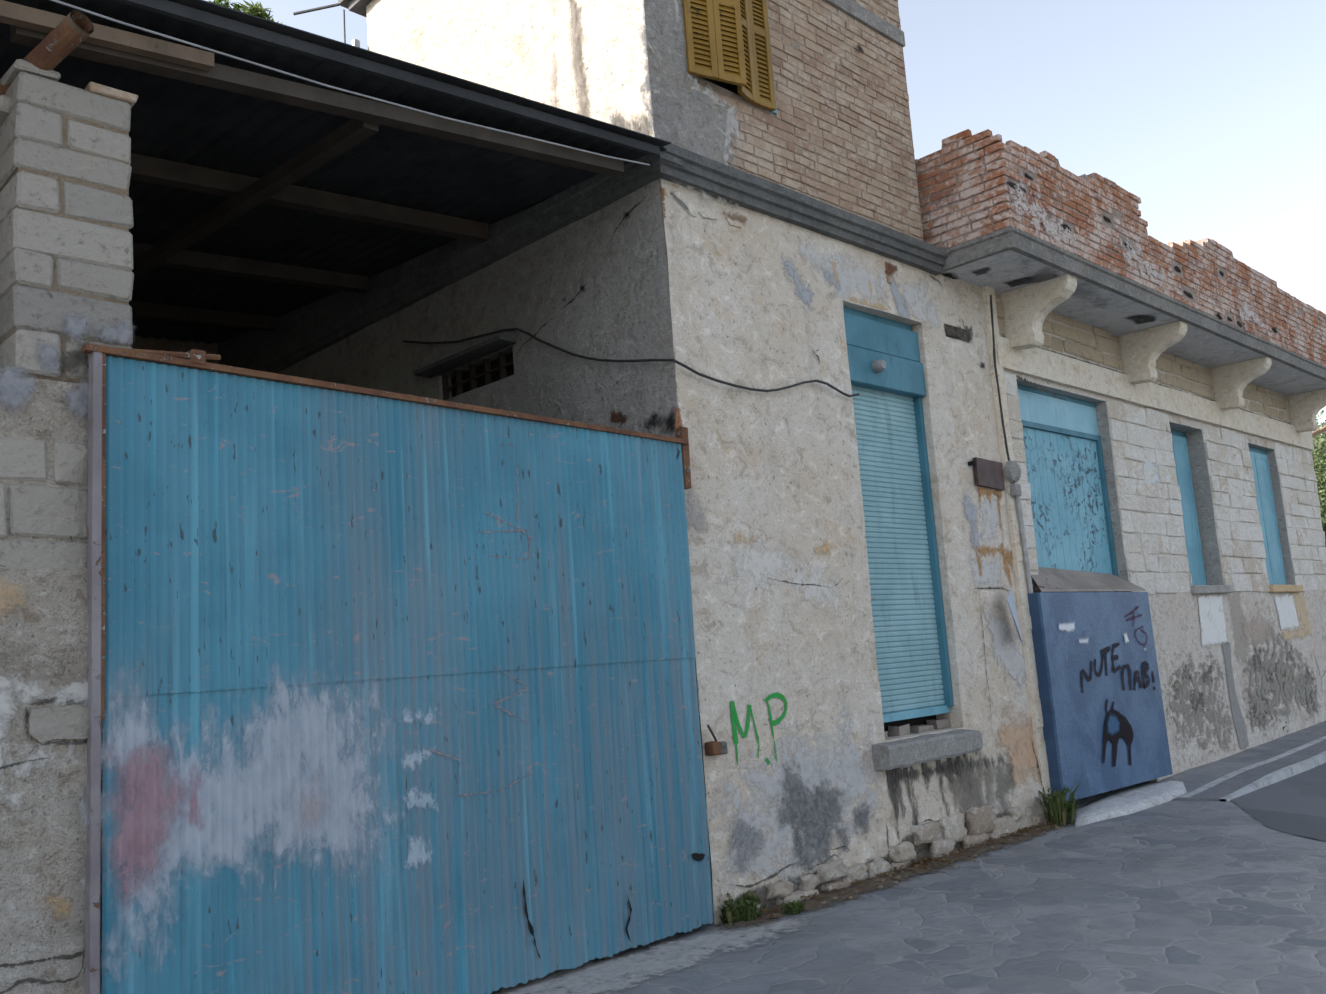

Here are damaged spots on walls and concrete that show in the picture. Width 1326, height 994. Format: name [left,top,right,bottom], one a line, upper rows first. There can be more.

leakage [553,0,588,117]
peeling [885,262,910,319]
rust [976,487,1013,586]
leakage [730,818,765,873]
leakage [777,766,870,874]
leakage [886,752,1015,839]
crack [0,950,85,994]